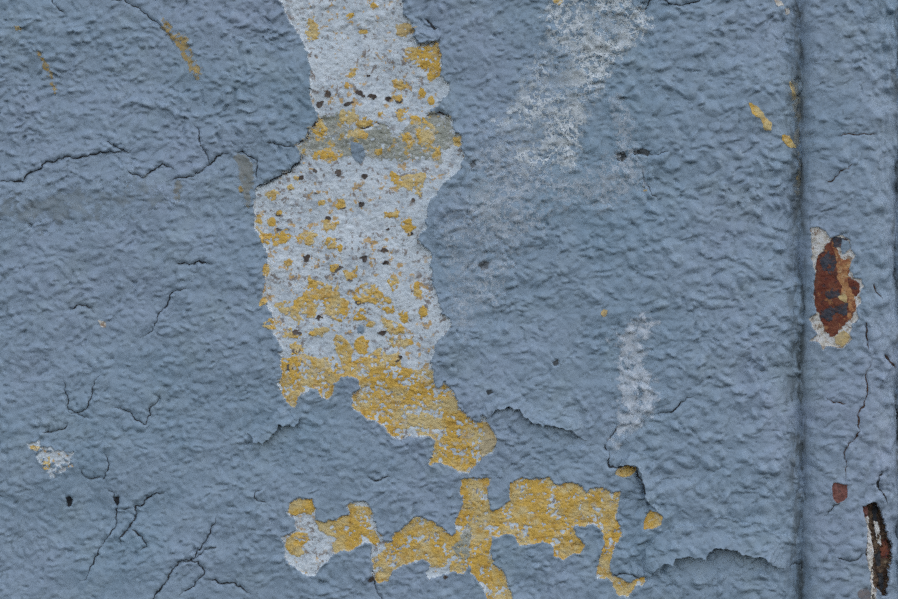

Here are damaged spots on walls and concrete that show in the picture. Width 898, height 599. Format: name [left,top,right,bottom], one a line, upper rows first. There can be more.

crack [632,0,700,12]
crack [2,118,323,187]
peeling [246,0,788,599]
rust [809,227,864,350]
crack [828,322,896,471]
peeling [26,440,74,479]
crack [78,454,164,581]
crack [153,512,249,599]
rust [863,502,892,599]